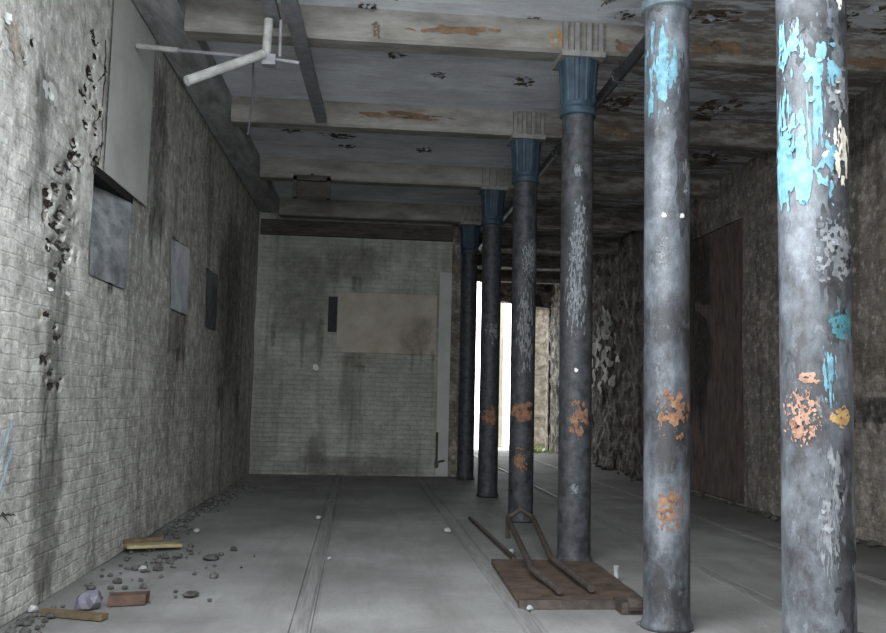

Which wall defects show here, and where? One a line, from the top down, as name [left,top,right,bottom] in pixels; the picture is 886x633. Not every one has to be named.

spalling [43,80,60,112]
spalling [79,29,107,137]
peeling [645,4,751,266]
spalling [41,137,100,291]
peeling [777,0,886,408]
spalling [39,353,62,391]
corrosion [482,406,498,428]
corrosion [510,401,532,422]
corrosion [567,399,589,440]
corrosion [656,389,690,440]
corrosion [783,372,851,448]
corrosion [653,486,684,533]